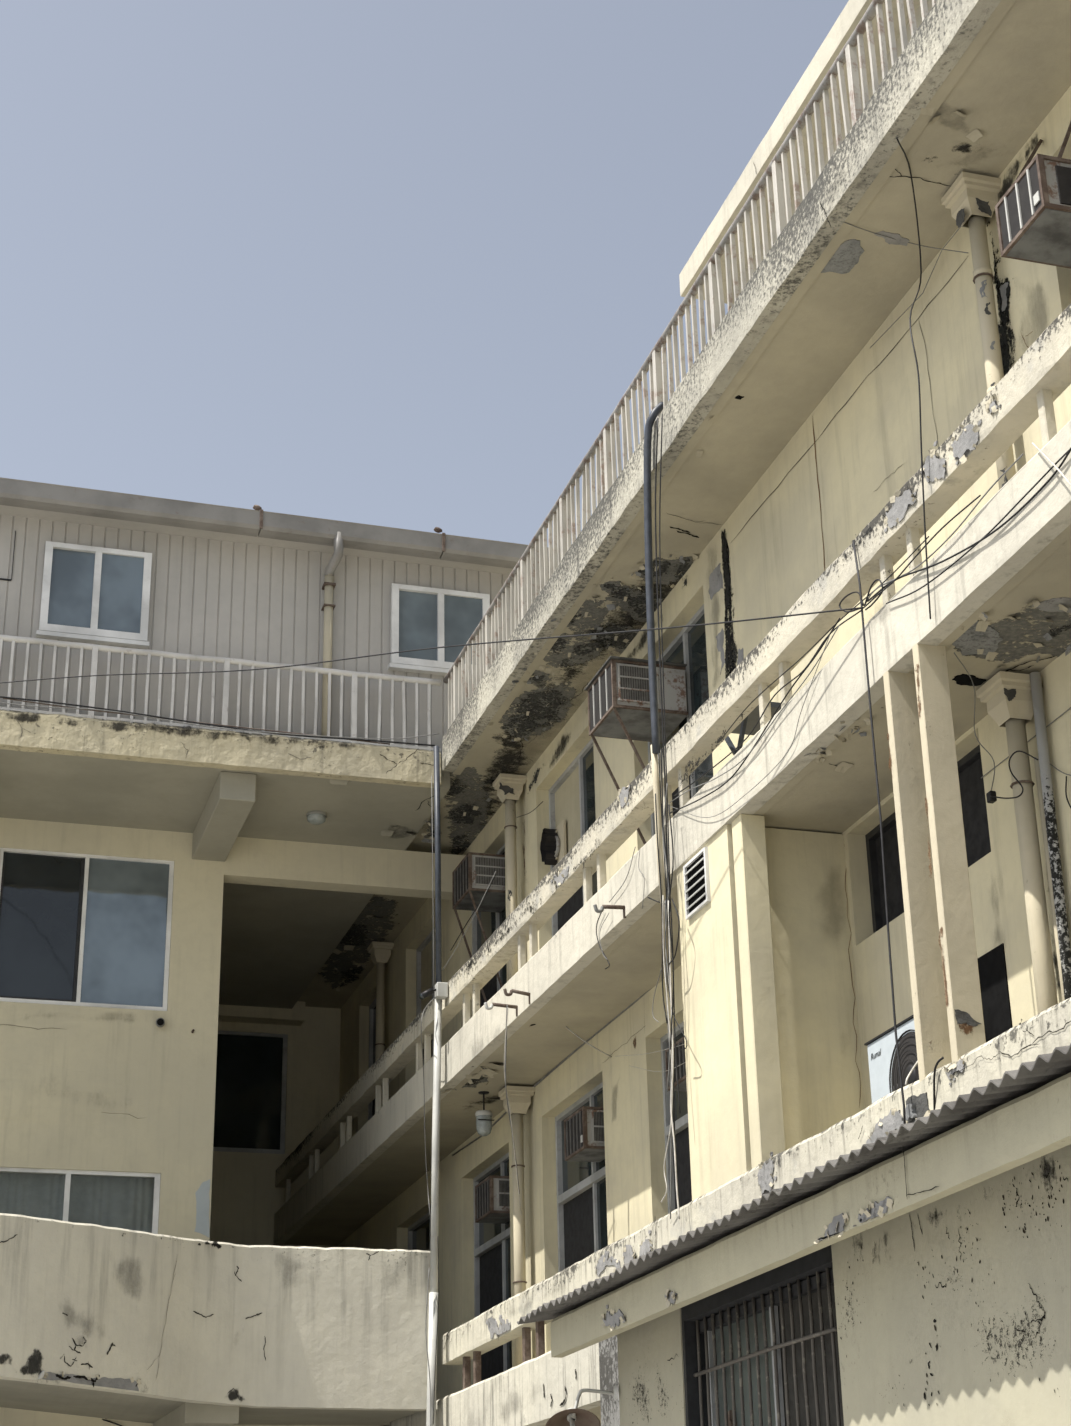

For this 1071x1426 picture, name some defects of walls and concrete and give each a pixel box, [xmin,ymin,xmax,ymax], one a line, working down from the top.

peeling [884,382,1001,532]
damp [709,529,744,678]
damp [523,564,687,719]
peeling [952,597,1071,686]
damp [7,712,40,722]
damp [101,722,318,744]
damp [468,731,569,825]
crack [956,1021,1071,1077]
peeling [866,1092,931,1144]
peeling [755,1152,777,1198]
peeling [814,1196,894,1244]
peeling [38,1370,141,1391]